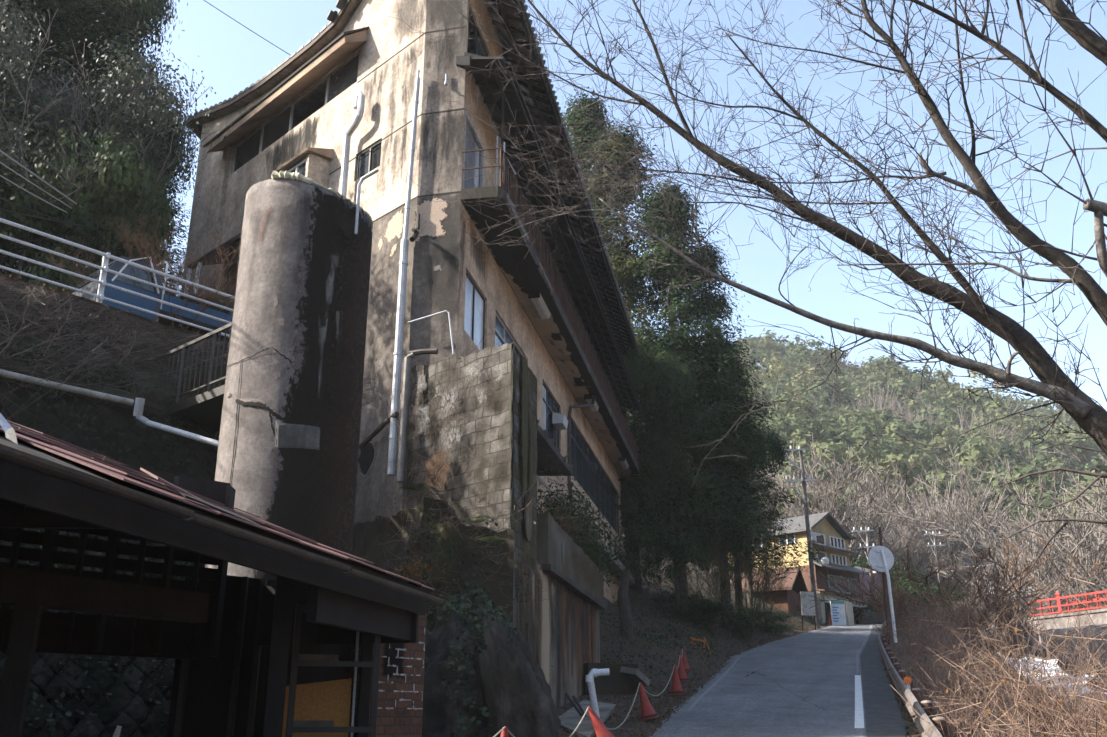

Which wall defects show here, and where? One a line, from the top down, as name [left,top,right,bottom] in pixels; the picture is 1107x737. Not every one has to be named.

leakage [398,0,463,33]
leakage [383,116,464,164]
peeling [378,198,450,257]
crack [227,347,293,483]